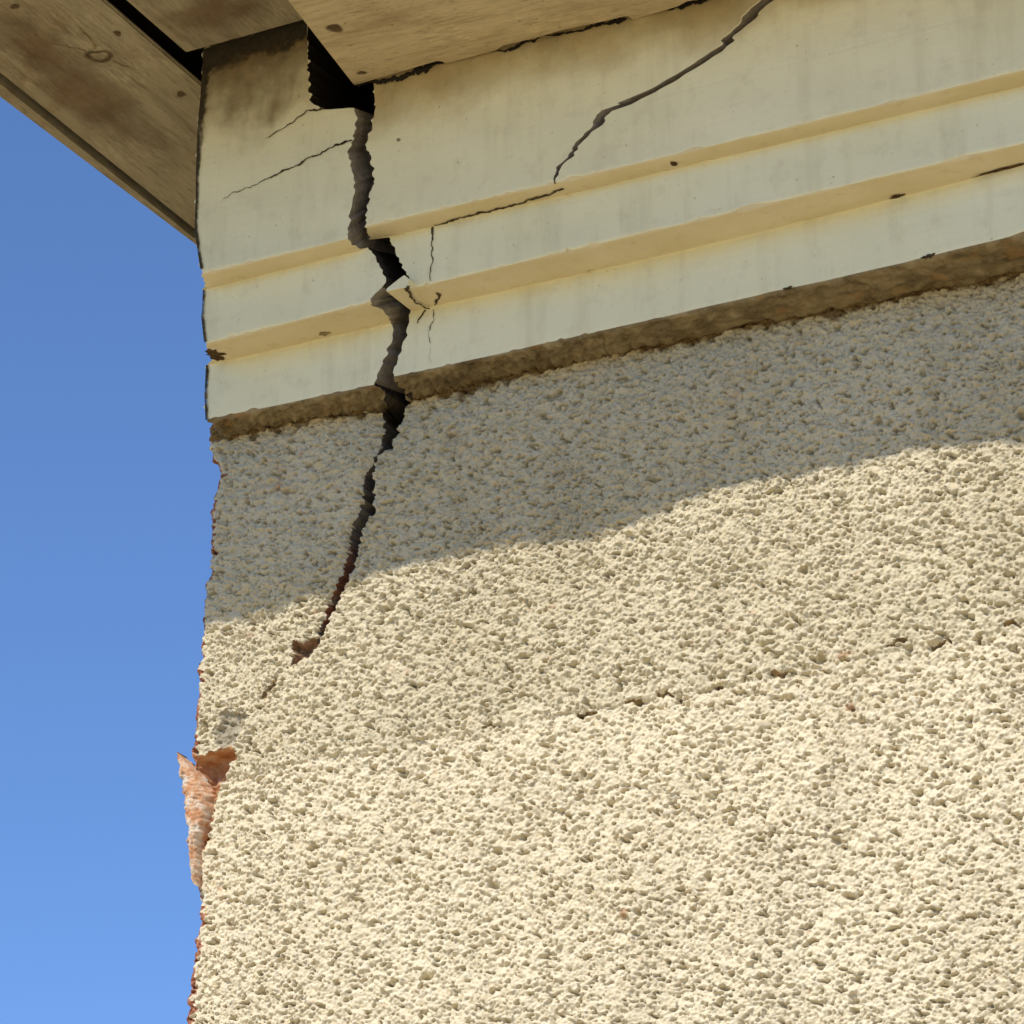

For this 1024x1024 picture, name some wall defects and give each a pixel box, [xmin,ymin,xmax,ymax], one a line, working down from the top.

crack [223,0,774,699]
spalling [177,427,250,1024]